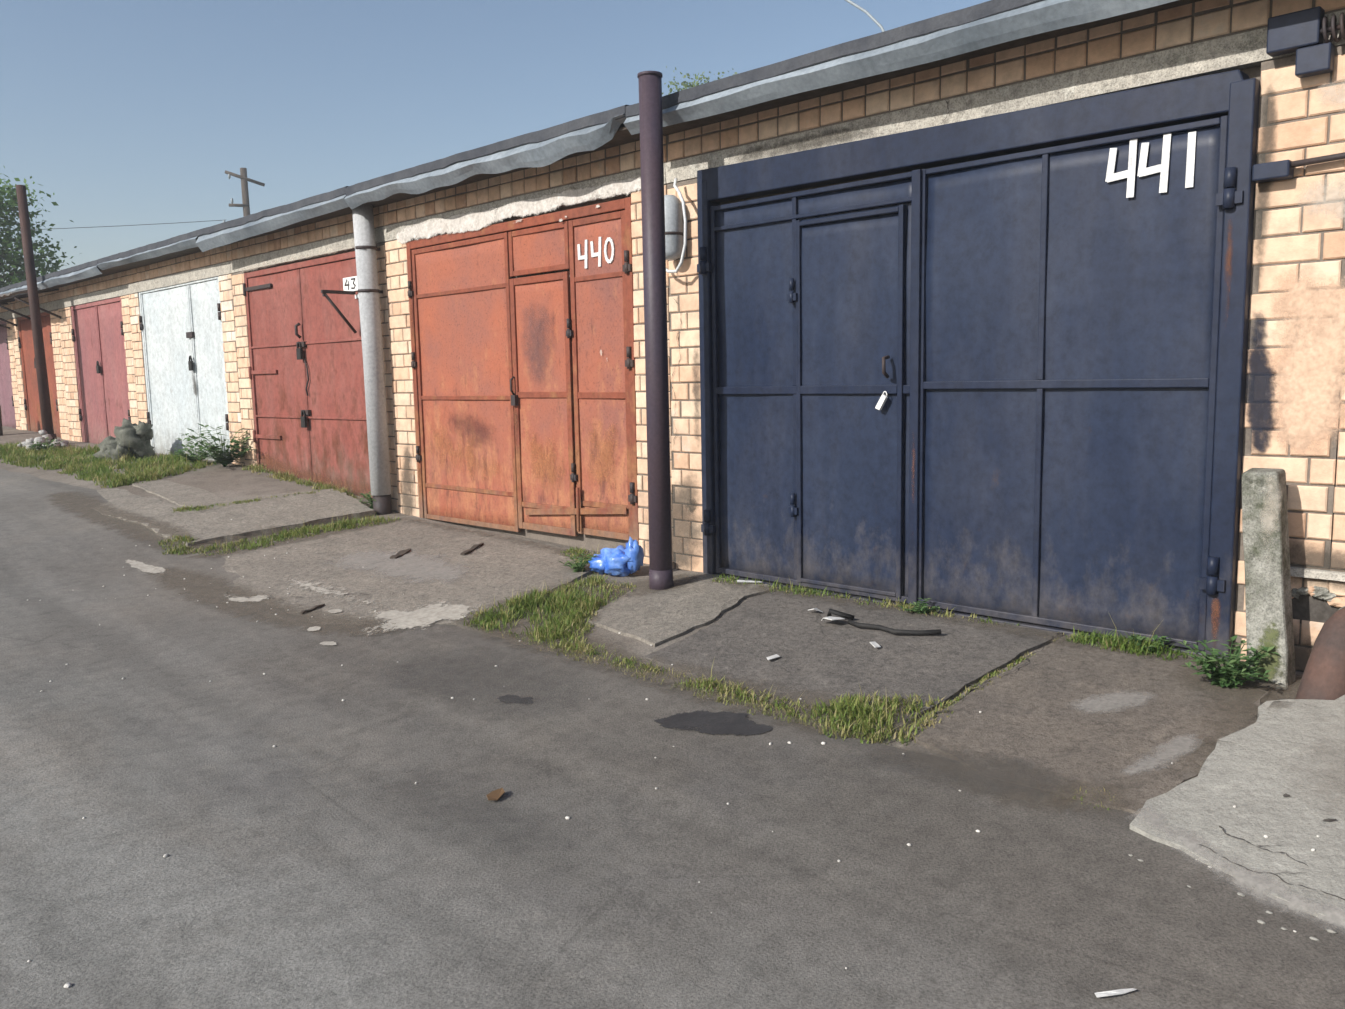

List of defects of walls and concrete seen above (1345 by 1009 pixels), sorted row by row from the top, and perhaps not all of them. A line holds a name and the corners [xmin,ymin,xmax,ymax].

spalling [1291,586,1345,624]
crack [1199,826,1345,900]